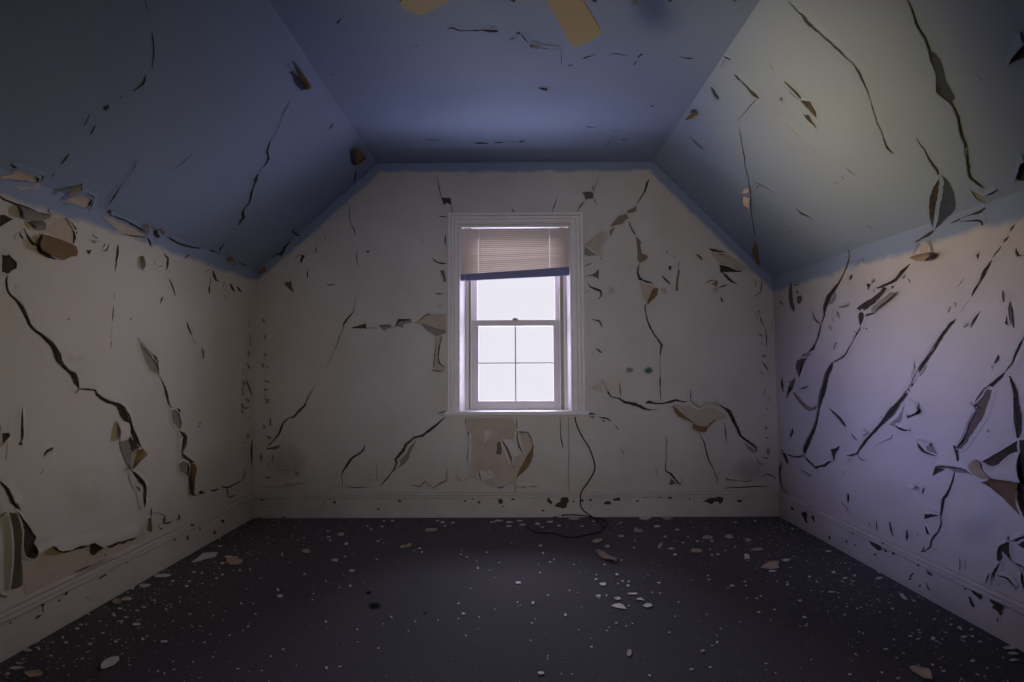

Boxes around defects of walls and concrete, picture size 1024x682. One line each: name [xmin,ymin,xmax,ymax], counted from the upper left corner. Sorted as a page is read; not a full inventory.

crack [785,0,898,156]
crack [902,0,983,190]
crack [15,408,54,473]
peeling [0,251,224,604]
crack [111,245,119,345]
peeling [0,162,307,278]
crack [266,284,413,450]
crack [334,409,446,488]
peeling [463,416,535,507]
peeling [583,138,1024,591]
crack [795,250,852,382]
crack [946,223,1024,331]